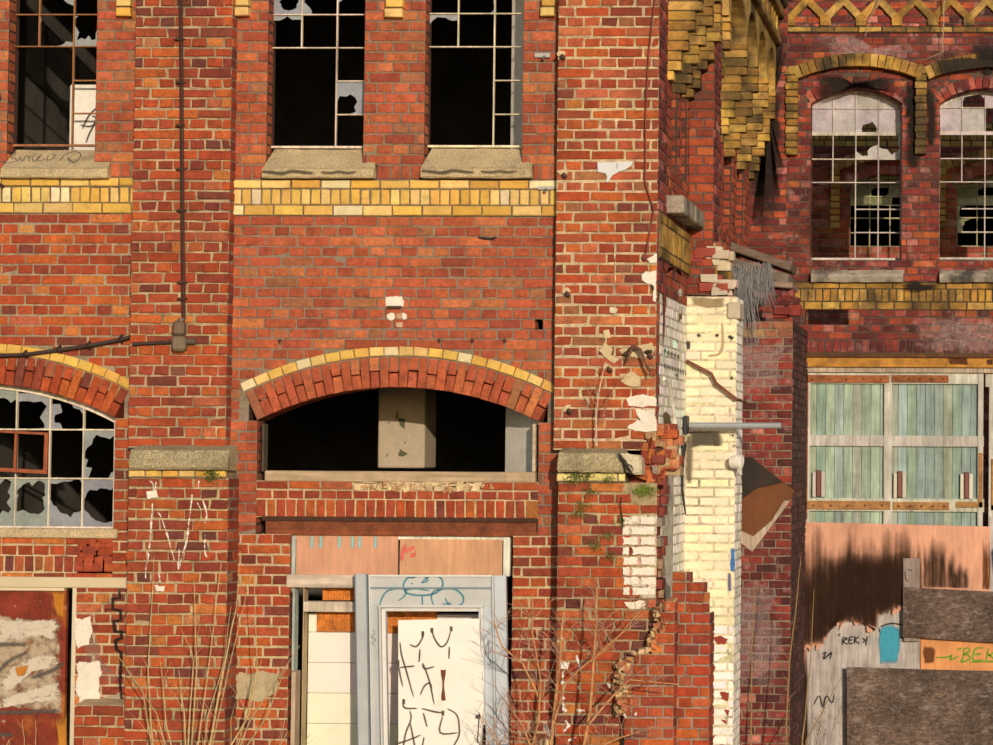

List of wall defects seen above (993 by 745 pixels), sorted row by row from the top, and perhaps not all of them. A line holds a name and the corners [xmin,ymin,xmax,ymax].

peeling [647,254,684,276]
peeling [653,286,667,336]
peeling [627,342,655,358]
spalling [620,372,671,484]
peeling [622,517,656,609]
rust [54,593,65,617]
peeling [75,661,120,703]
rust [56,719,67,745]